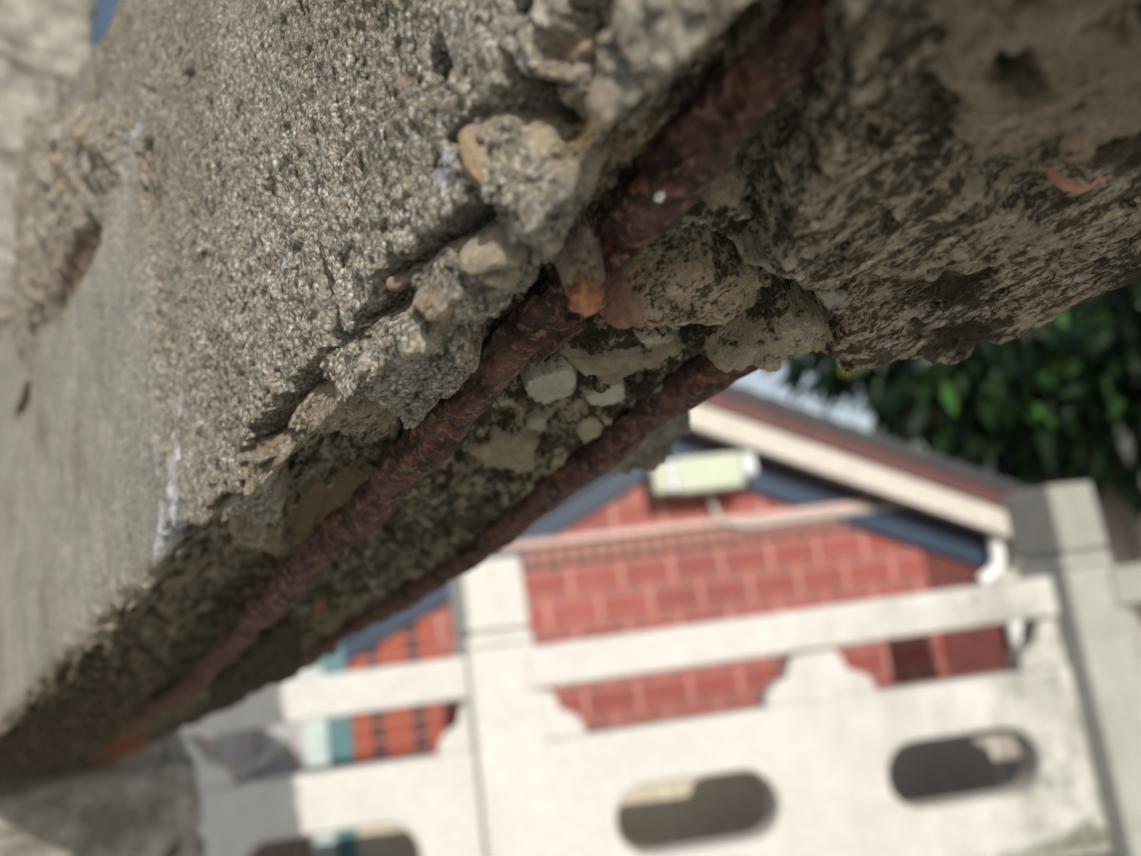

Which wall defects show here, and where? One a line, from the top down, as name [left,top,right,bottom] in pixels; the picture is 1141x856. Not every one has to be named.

corrosion [82,0,831,769]
spalling [72,0,880,769]